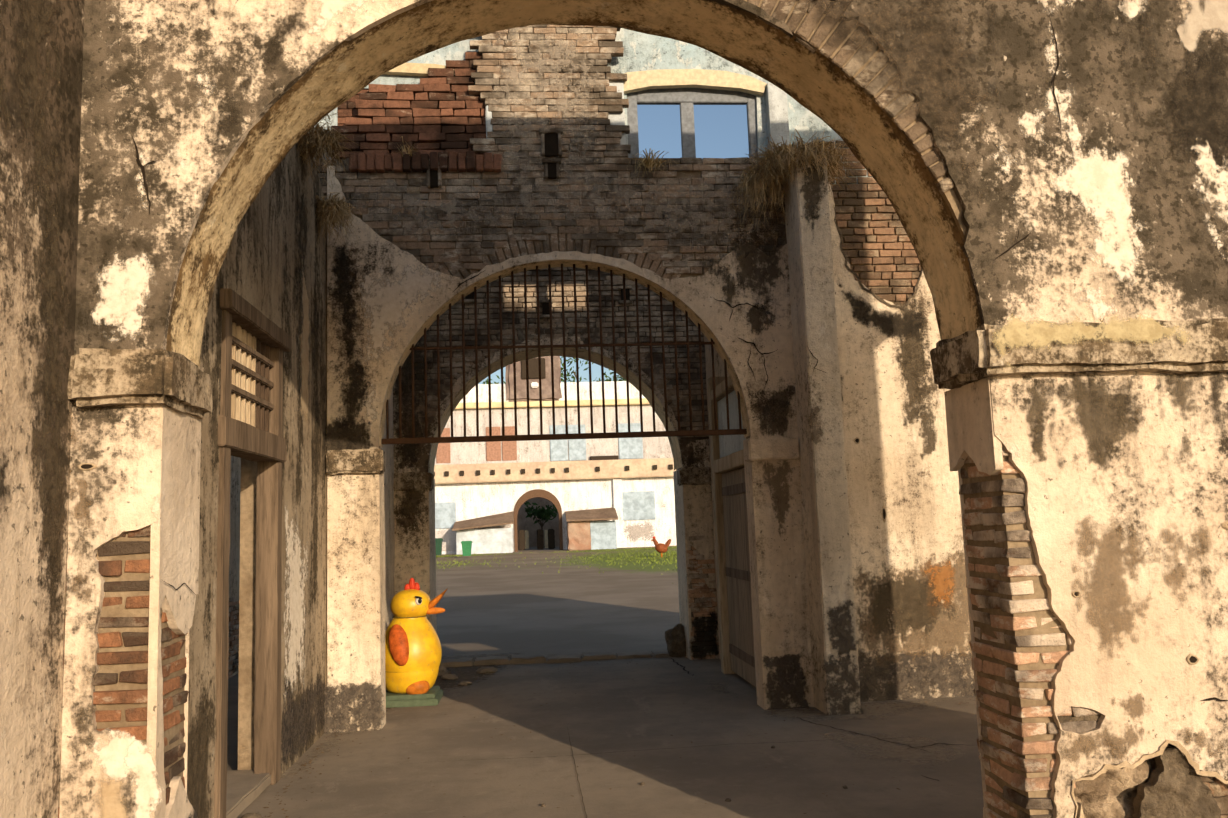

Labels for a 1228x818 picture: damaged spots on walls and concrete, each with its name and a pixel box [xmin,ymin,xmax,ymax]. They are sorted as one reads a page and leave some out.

crack [131,134,158,214]
leakage [211,114,237,152]
leakage [231,14,305,98]
crack [1049,17,1063,140]
leakage [1164,38,1228,175]
leakage [0,0,92,659]
crack [714,298,778,389]
spalling [89,526,190,818]
leakage [767,551,972,763]
spalling [858,446,1101,818]
spalling [1071,740,1228,818]